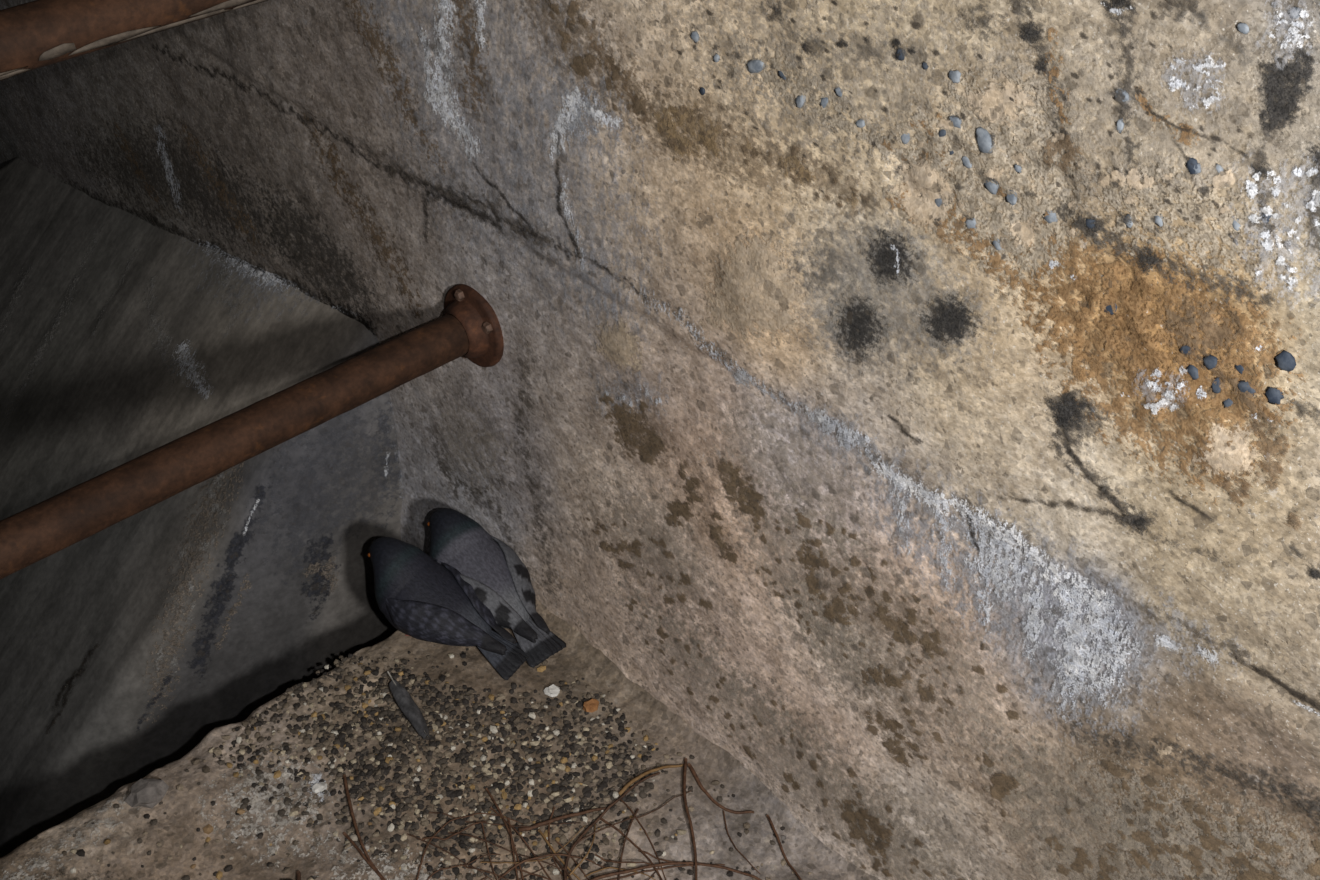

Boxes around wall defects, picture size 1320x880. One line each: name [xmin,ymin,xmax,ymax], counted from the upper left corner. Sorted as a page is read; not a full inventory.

crack [153,44,639,294]
rust [1135,88,1199,147]
rust [886,125,1305,508]
crack [890,416,923,443]
damp [633,283,1218,719]
crack [962,504,980,552]
crack [1000,426,1232,567]
crack [1232,654,1320,716]